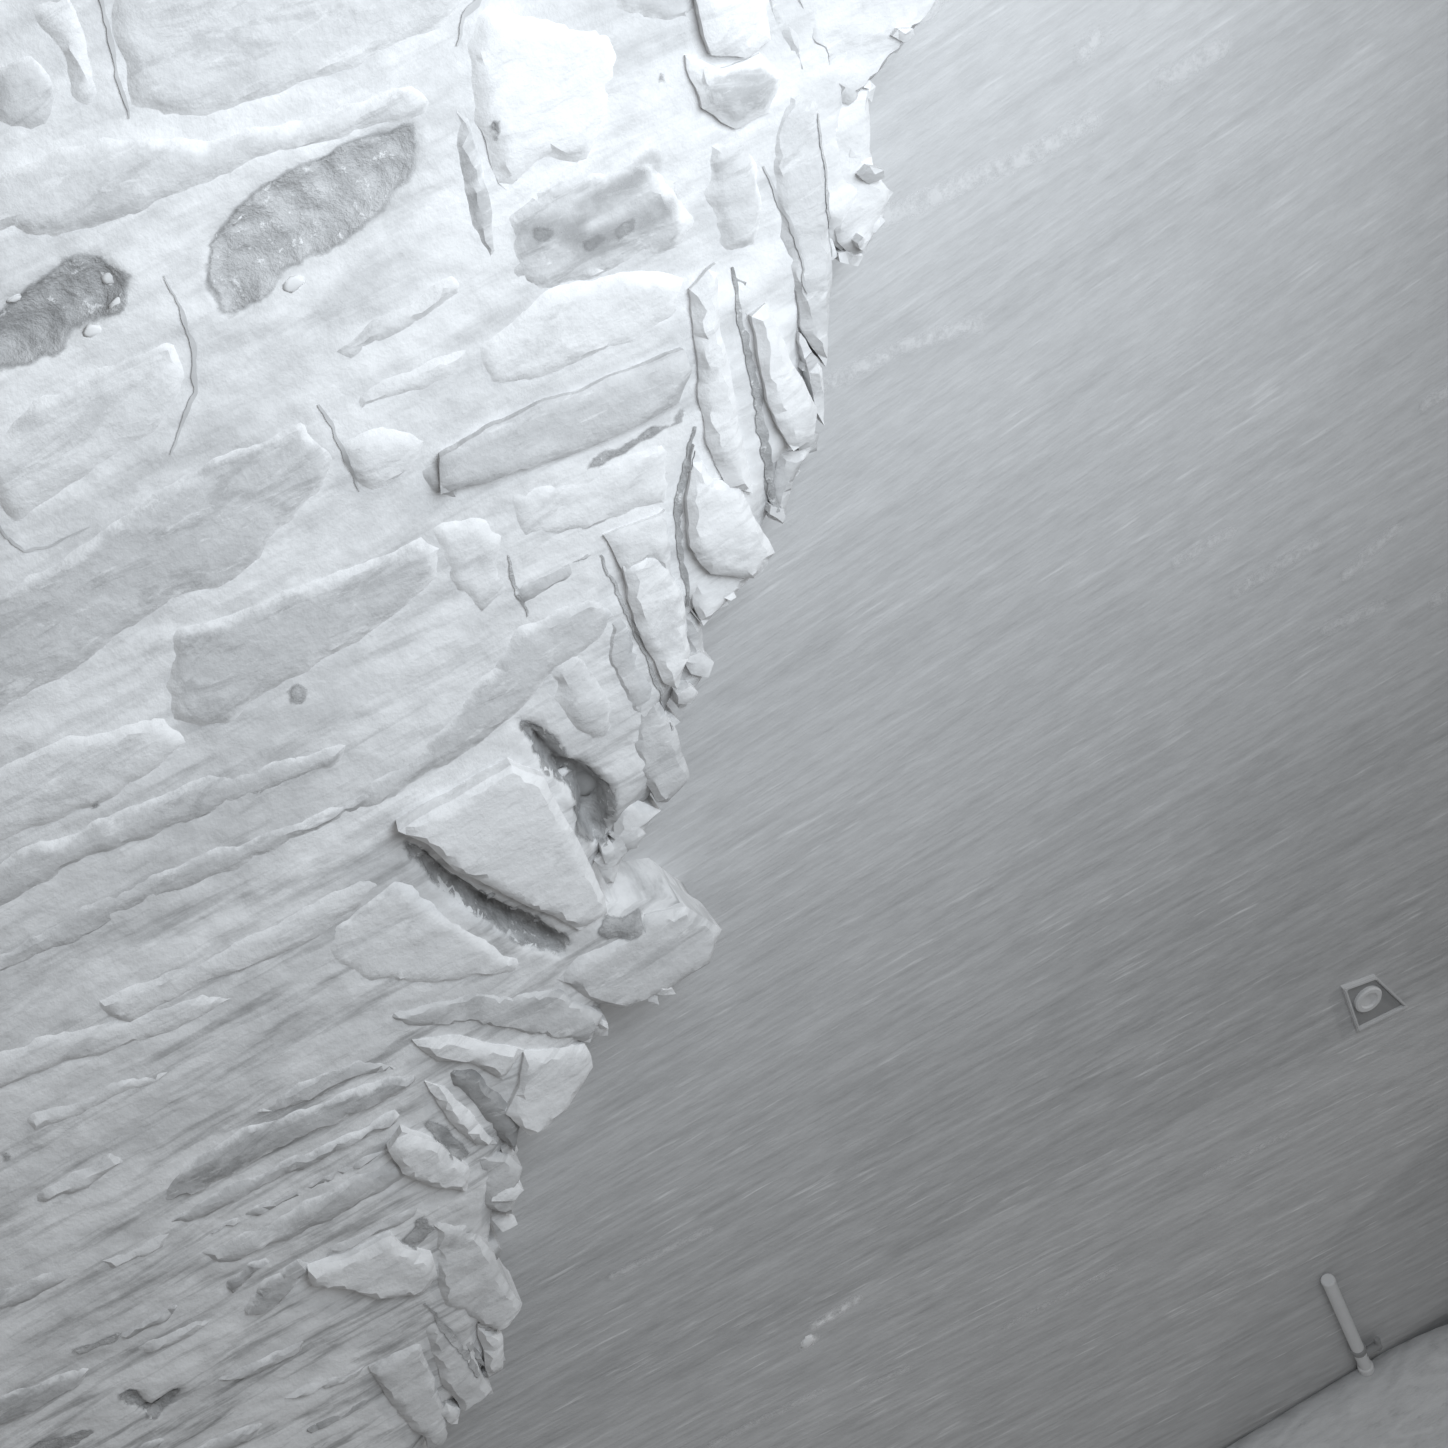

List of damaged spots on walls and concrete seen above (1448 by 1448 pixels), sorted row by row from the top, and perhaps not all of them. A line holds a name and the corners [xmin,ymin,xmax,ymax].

spalling [208,124,416,313]
spalling [535,228,553,241]
spalling [584,219,635,251]
spalling [0,255,127,368]
spalling [290,685,307,704]
spalling [520,720,617,845]
spalling [119,1389,180,1419]